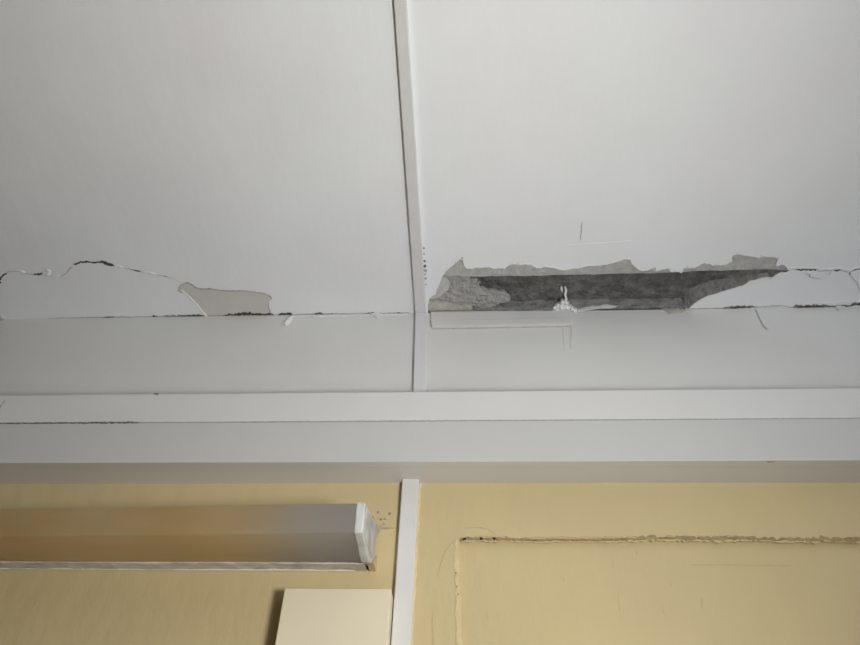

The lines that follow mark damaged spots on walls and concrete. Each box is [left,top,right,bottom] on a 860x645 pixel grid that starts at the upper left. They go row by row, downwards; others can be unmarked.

peeling [177,282,272,317]
spalling [428,253,788,315]
crack [685,266,860,311]
crack [437,527,860,577]